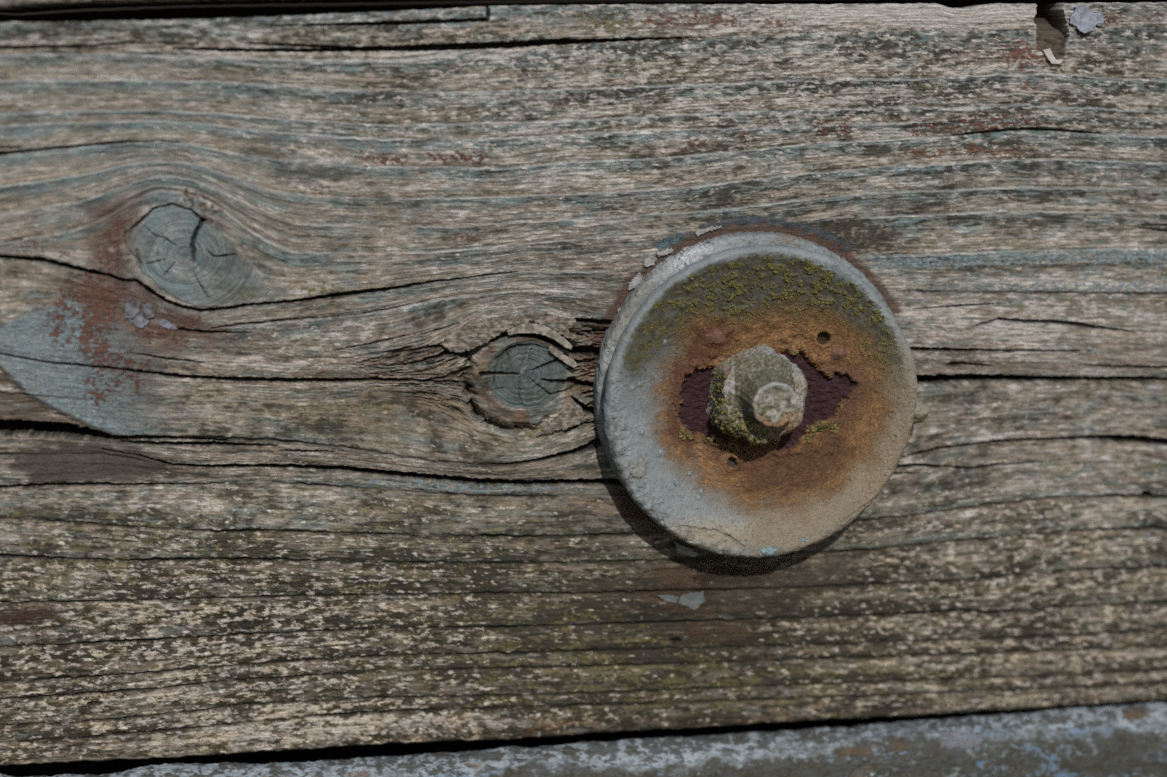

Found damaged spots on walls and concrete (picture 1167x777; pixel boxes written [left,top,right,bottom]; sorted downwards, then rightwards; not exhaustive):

peeling [124,298,178,330]
crack [0,202,624,490]
rust [586,222,900,373]
crack [910,301,1167,386]
rust [654,308,888,511]
rust [617,489,651,522]
crack [839,434,1167,524]